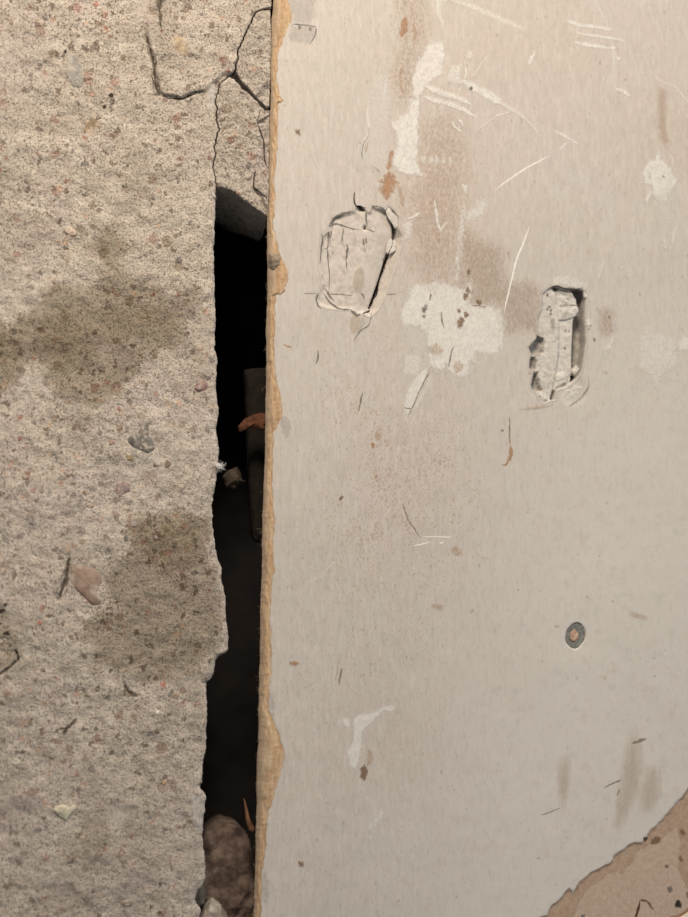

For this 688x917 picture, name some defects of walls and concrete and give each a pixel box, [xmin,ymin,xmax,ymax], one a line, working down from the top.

crack [144,0,270,200]
spalling [527,284,592,406]